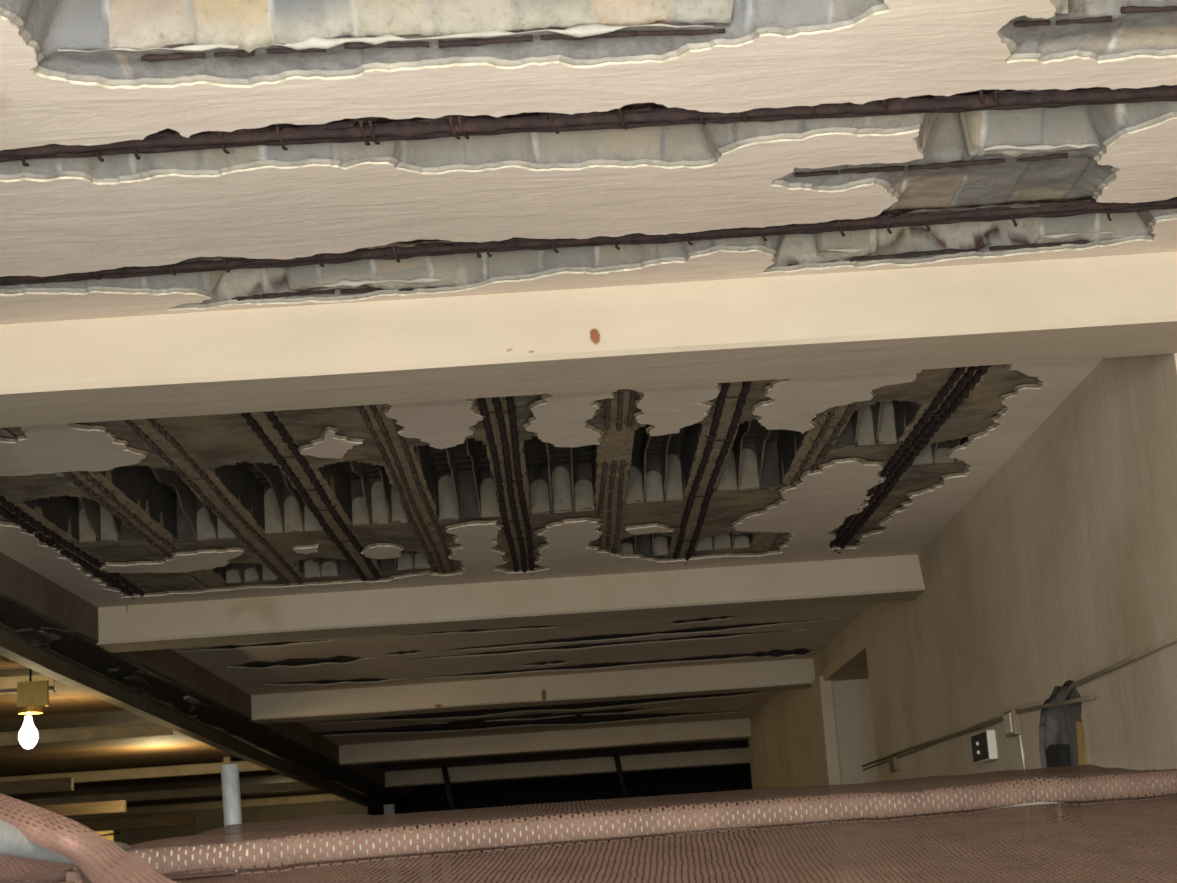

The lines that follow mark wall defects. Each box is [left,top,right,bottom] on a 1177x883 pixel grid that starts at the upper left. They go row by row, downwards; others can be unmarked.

spalling [0,0,889,86]
spalling [997,0,1177,61]
rust [0,85,1177,167]
spalling [0,101,1177,309]
rust [0,197,1177,286]
rust [590,329,600,344]
spalling [0,378,792,599]
spalling [730,364,1011,553]